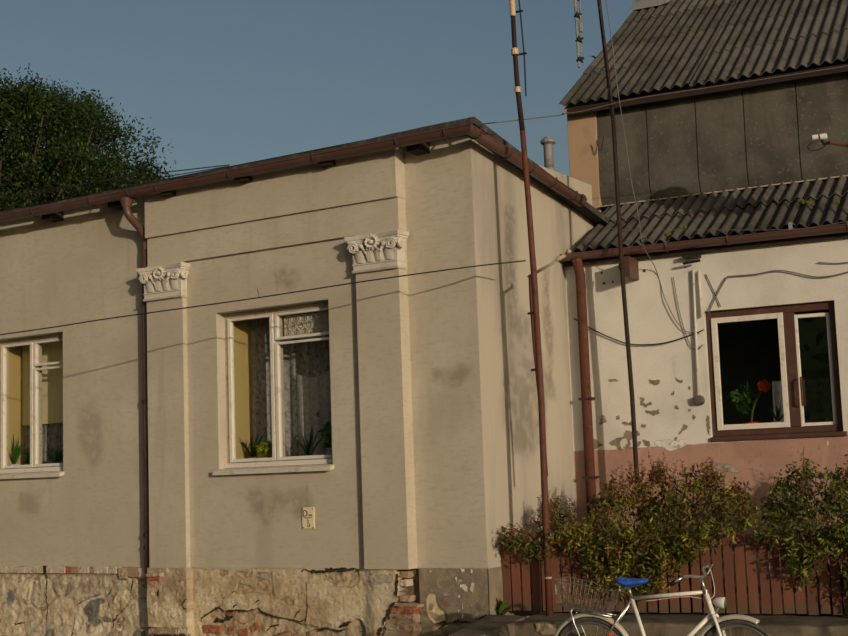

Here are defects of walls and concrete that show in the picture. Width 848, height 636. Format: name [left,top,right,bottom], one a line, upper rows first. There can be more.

peeling [593,415,650,451]
peeling [640,397,659,416]
spalling [0,566,366,636]
flaking render [383,568,478,636]